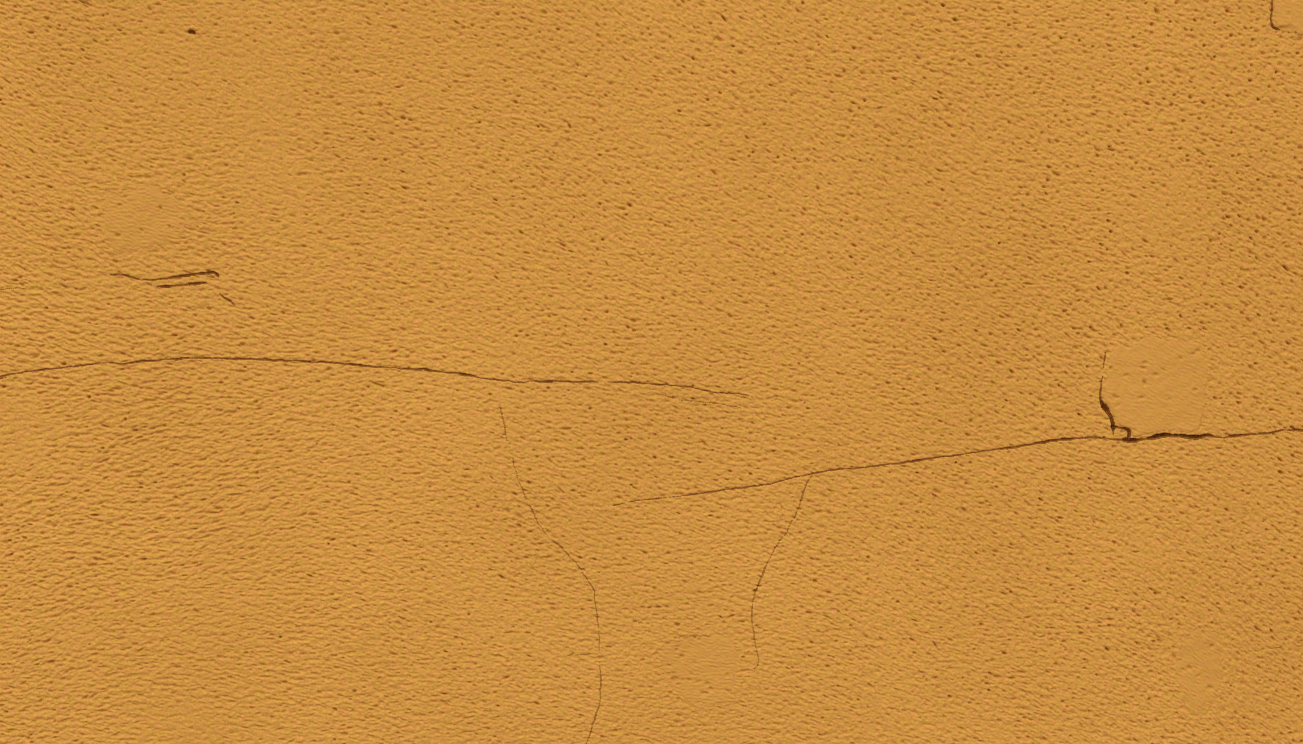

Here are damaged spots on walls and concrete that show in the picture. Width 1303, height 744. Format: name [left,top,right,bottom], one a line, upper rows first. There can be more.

crack [113,271,234,305]
crack [0,357,748,744]
crack [613,352,1303,669]